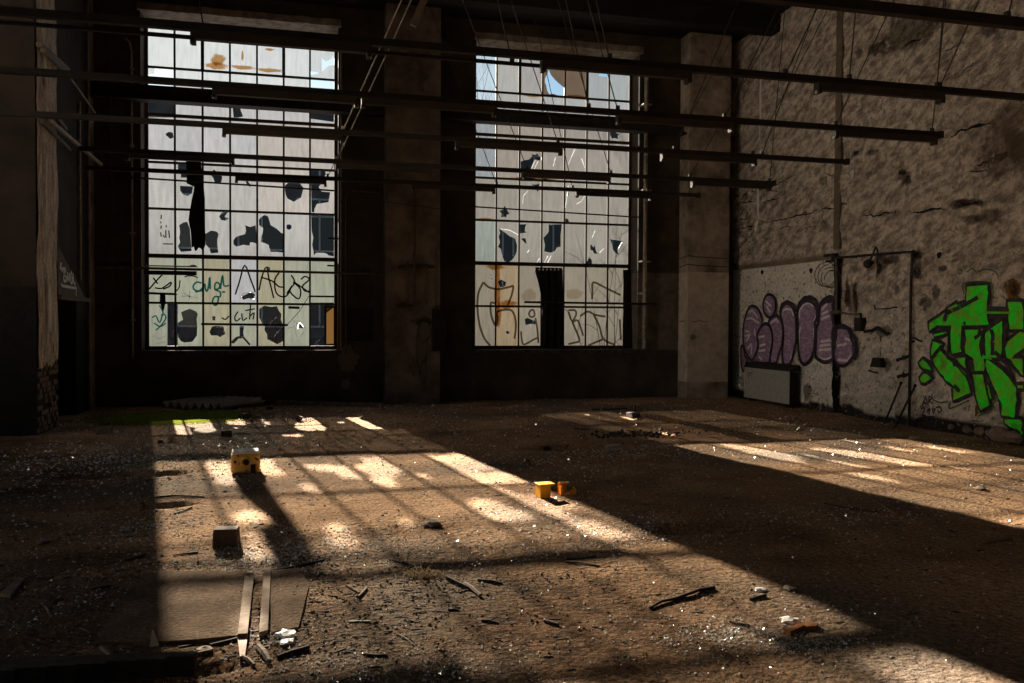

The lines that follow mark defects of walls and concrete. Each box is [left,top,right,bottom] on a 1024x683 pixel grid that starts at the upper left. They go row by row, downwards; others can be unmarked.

crack [947,123,991,138]
crack [732,172,969,239]
leakage [951,199,983,209]